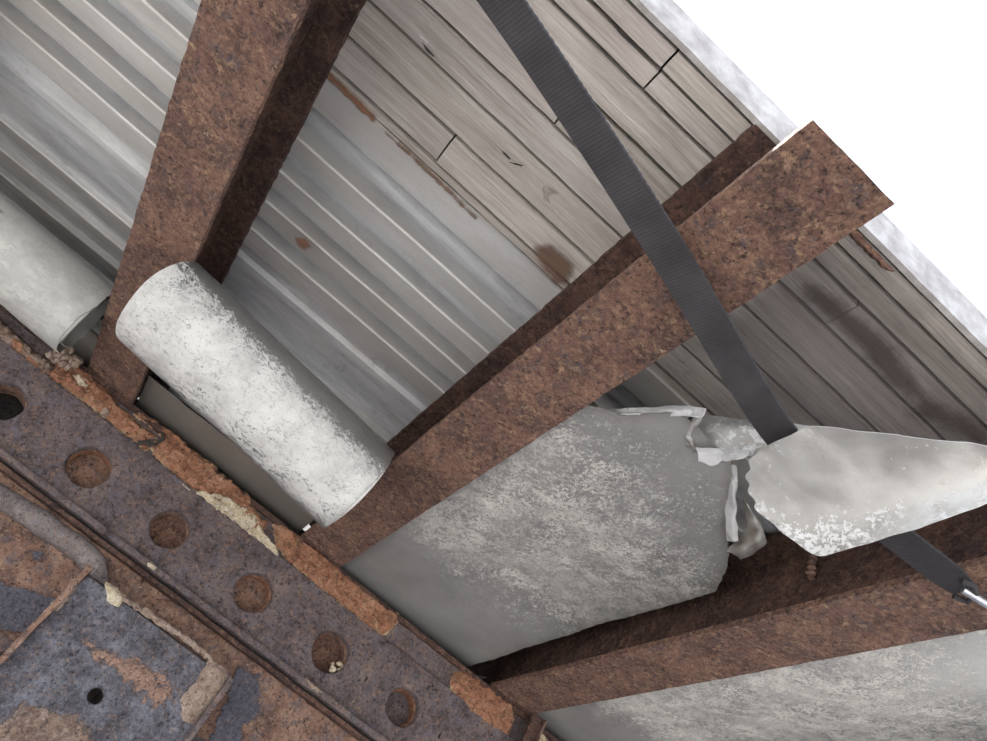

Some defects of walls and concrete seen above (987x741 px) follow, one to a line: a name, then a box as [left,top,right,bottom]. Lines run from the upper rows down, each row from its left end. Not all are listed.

corrosion [327,73,375,121]
corrosion [386,134,477,219]
damp [535,246,571,283]
corrosion [848,230,894,272]
damp [810,288,987,443]
corrosion [0,318,400,636]
peeling [182,483,279,556]
peeling [0,581,55,633]
corrosion [83,582,227,725]
corrosion [0,701,94,741]
peeling [209,667,261,741]
corrosion [449,671,514,735]